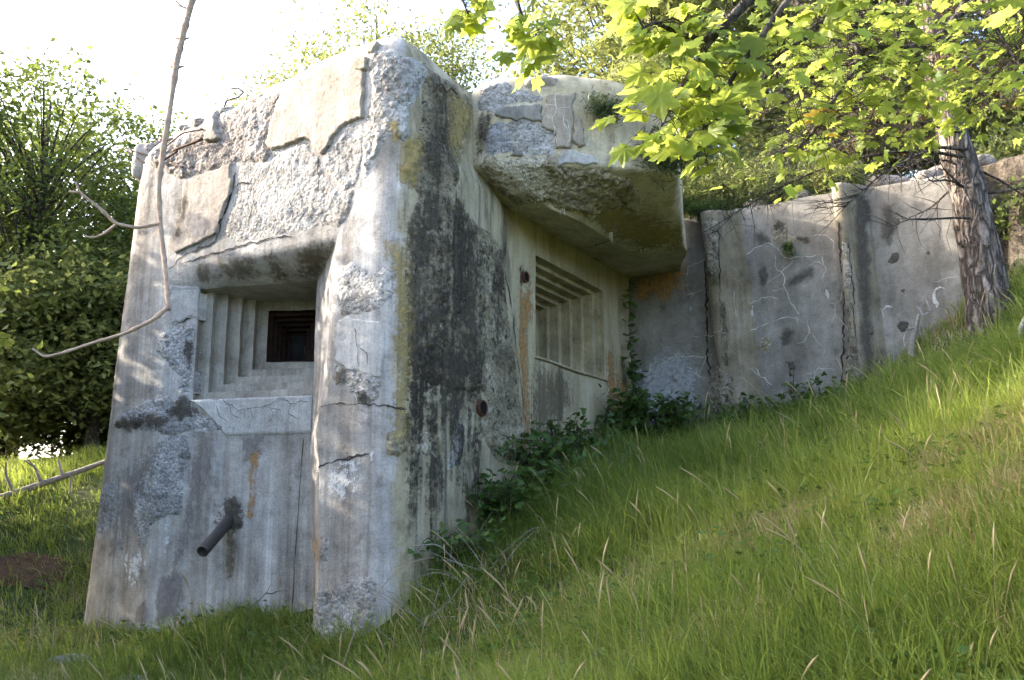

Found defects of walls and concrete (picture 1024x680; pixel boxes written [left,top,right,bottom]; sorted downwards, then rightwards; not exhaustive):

spalling [113,285,222,548]
corrosion [247,450,260,518]
crack [212,398,407,426]
crack [318,453,369,468]
spalling [150,41,641,462]
damp [385,73,506,542]
corrosion [514,289,533,459]
crack [660,227,861,381]
spalling [312,577,377,640]